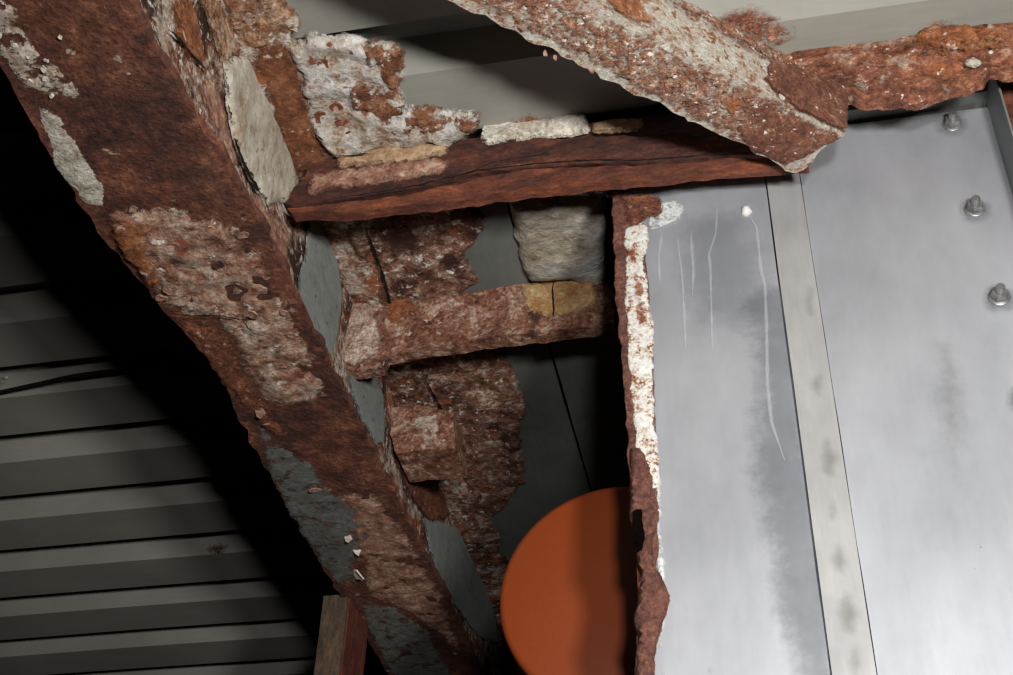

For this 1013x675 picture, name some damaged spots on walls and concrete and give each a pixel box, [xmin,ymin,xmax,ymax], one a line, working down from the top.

rust [173,0,204,62]
rust [224,0,328,172]
spalling [288,30,482,157]
rust [350,38,481,136]
rust [472,0,849,164]
rust [620,194,664,226]
efflorescence [649,201,684,230]
rust [109,205,326,405]
peeling [624,223,670,675]
damp [656,480,666,585]